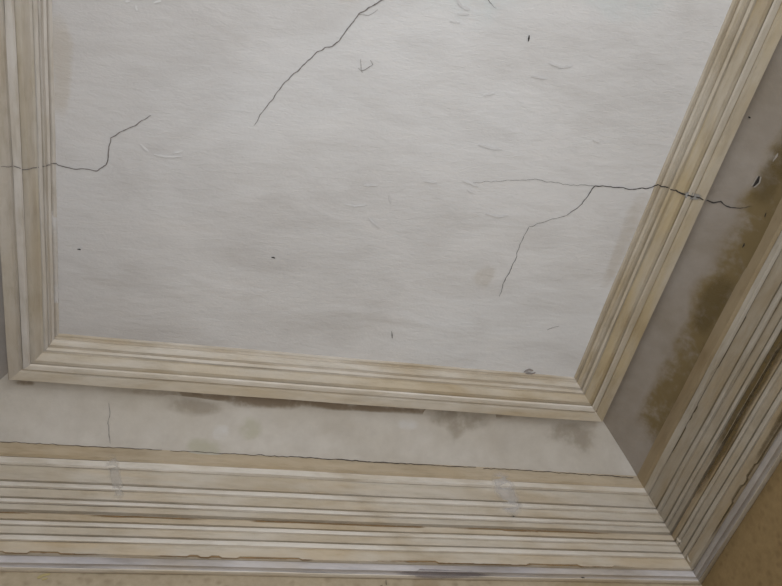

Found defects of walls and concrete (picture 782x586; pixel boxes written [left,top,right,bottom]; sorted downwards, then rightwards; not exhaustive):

crack [255,0,382,124]
crack [1,116,149,172]
crack [499,179,750,296]
damp [631,117,782,475]
damp [716,413,782,528]